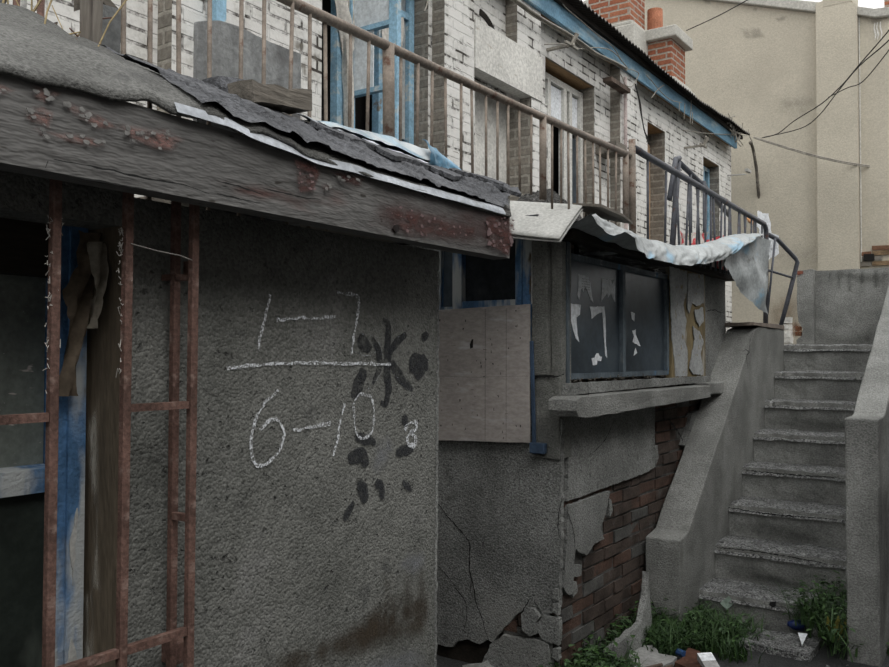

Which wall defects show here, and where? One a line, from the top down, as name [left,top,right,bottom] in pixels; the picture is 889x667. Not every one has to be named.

peeling [669,266,704,377]
crack [438,504,489,640]
flaking render [437,399,702,667]